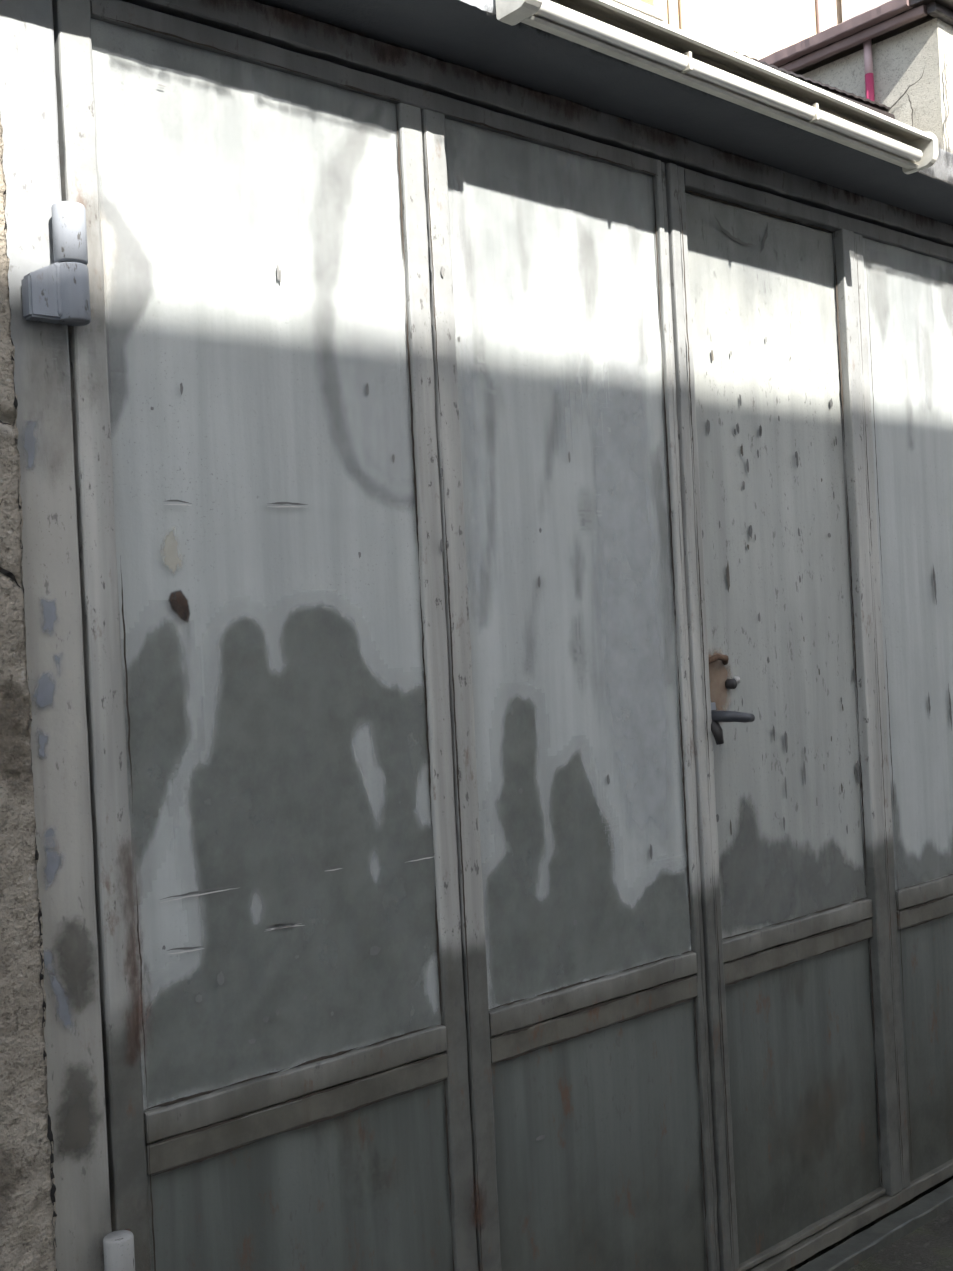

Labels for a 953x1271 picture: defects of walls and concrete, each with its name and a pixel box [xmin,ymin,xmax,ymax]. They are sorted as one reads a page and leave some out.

crack [888,29,953,151]
crack [0,114,57,1271]
leakage [125,621,191,862]
leakage [144,604,442,1106]
leakage [487,696,691,1005]
rust [708,651,730,710]
leakage [720,800,867,930]